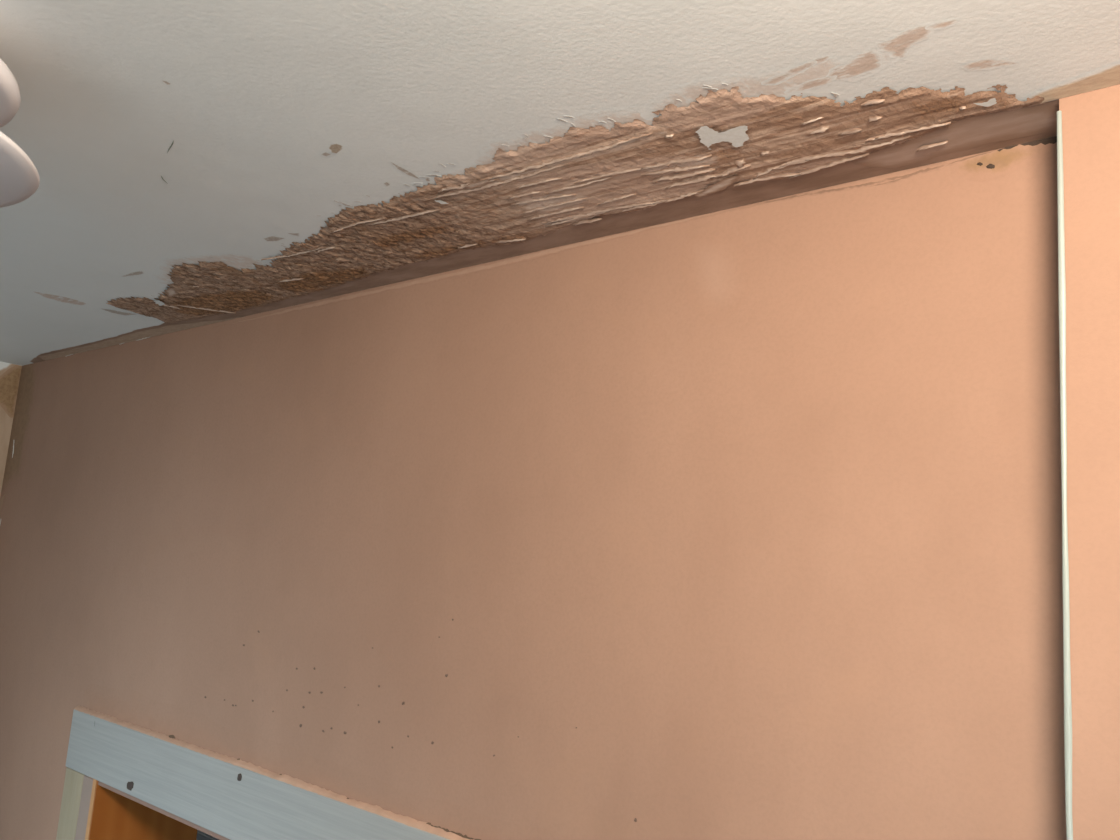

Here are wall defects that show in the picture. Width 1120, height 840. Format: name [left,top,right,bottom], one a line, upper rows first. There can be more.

peeling [106,49,1045,323]